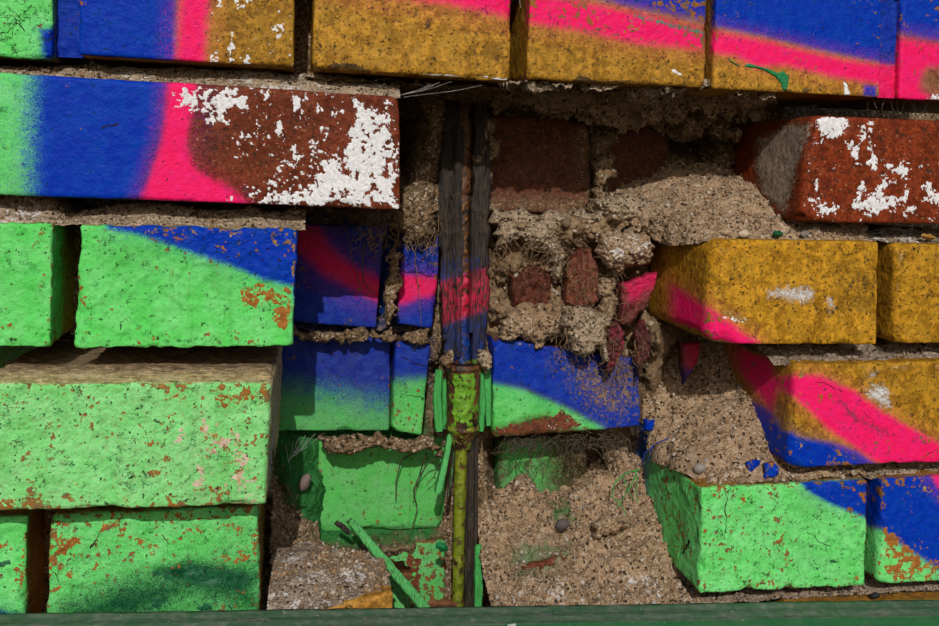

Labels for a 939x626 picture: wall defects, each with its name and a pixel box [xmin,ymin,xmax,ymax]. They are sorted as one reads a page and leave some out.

peeling [496,408,589,437]
peeling [405,554,422,593]